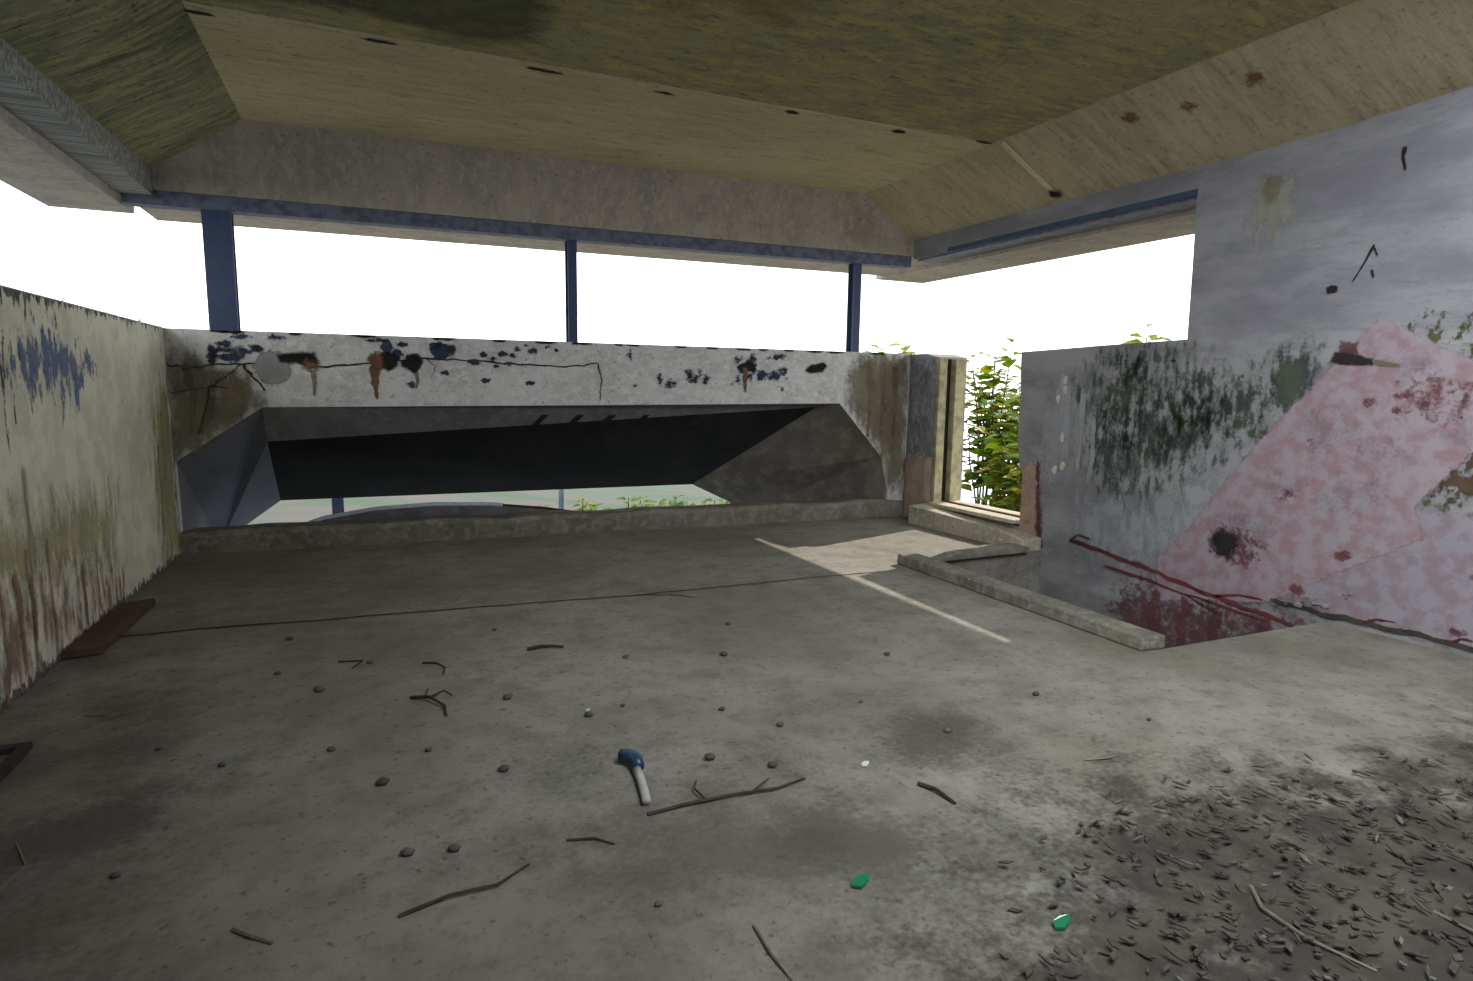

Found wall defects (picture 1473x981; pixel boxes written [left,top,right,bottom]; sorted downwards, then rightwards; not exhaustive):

leakage [283,0,549,41]
peeling [0,287,181,703]
leakage [1106,578,1303,649]